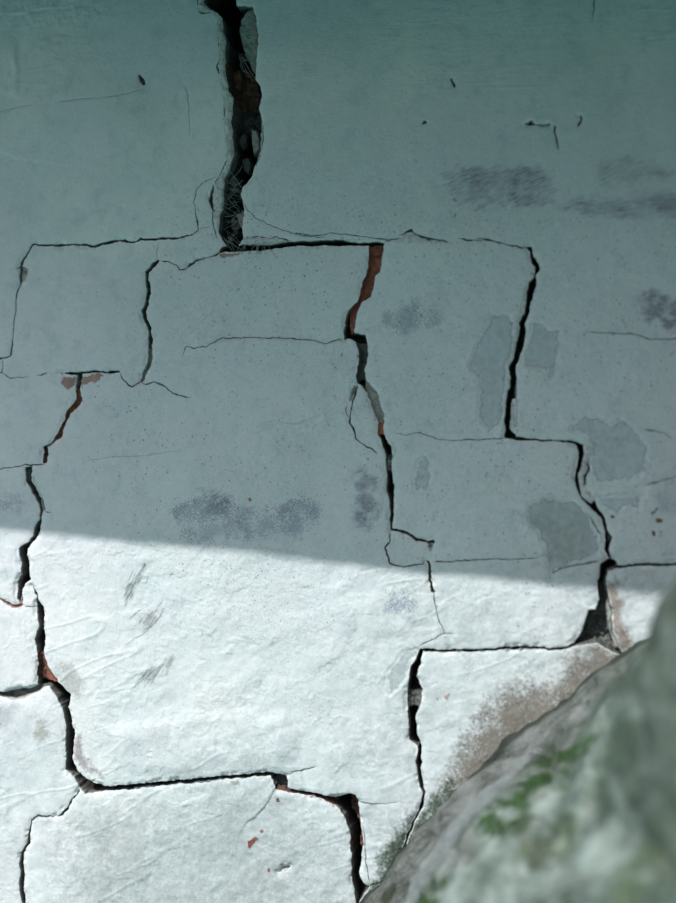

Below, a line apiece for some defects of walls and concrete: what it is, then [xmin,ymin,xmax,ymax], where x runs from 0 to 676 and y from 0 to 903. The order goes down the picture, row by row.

crack [0,0,612,645]
crack [0,587,395,903]
crack [402,644,573,848]